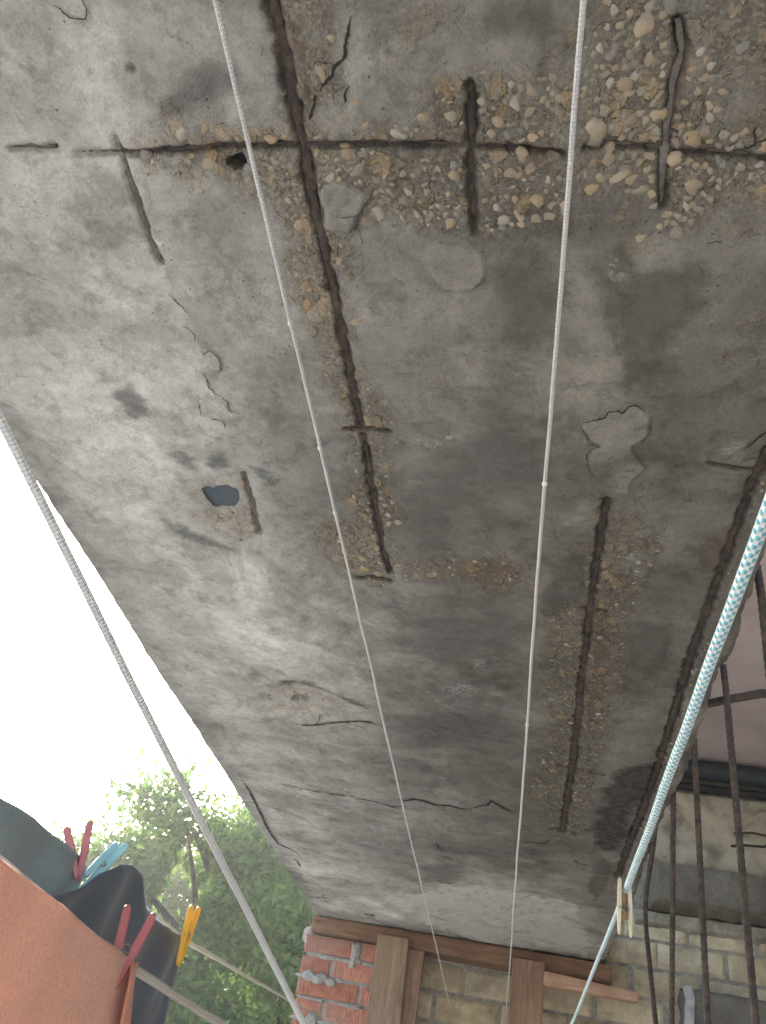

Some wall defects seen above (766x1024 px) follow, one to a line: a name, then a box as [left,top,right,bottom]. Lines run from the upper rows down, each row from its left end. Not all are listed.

crack [309,16,352,120]
spalling [567,0,766,262]
crack [168,293,237,427]
spalling [0,0,686,842]
leakage [593,255,705,390]
crack [207,780,308,867]
crack [355,797,513,813]